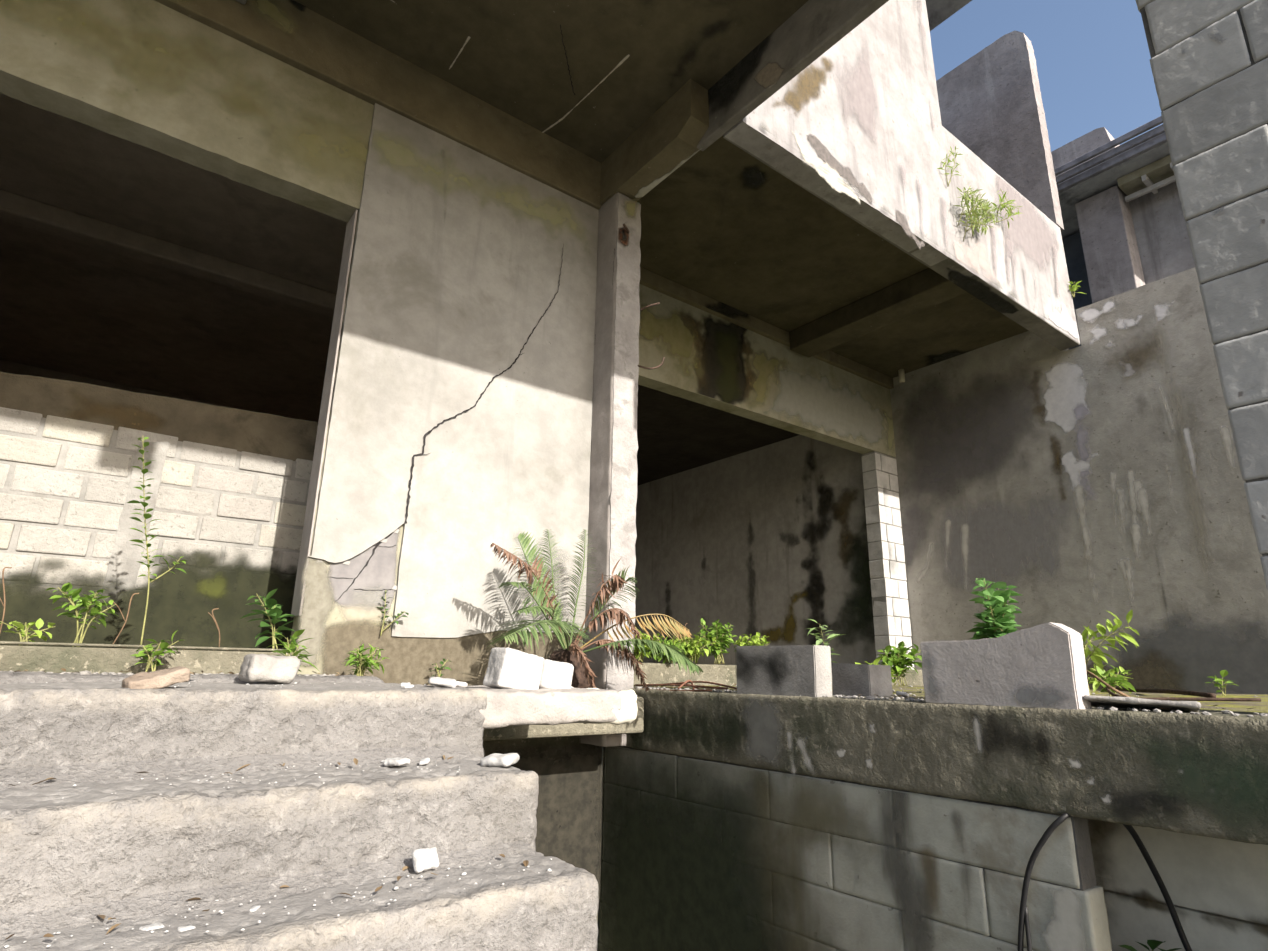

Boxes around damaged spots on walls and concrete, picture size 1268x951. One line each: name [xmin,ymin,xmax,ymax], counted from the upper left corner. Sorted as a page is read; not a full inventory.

peeling [795,134,872,204]
peeling [896,210,925,248]
crack [404,244,564,523]
water stain [680,302,756,405]
water stain [774,370,1045,492]
peeling [1044,363,1098,602]
flaking render [316,527,400,622]
water stain [782,453,875,645]
water stain [888,504,1055,588]
water stain [628,698,811,773]
water stain [974,715,1048,764]
water stain [884,791,937,951]